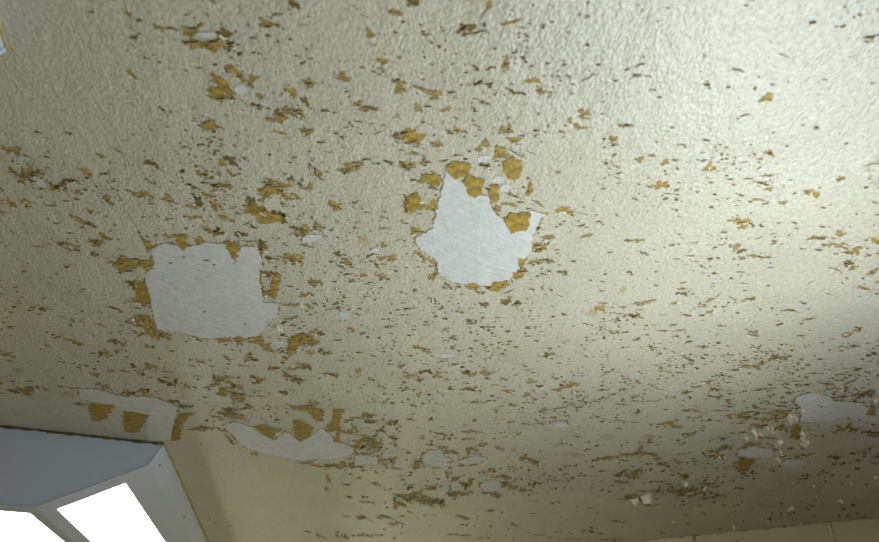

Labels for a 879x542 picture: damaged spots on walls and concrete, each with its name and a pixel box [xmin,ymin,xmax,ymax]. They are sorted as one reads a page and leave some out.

peeling [388,0,420,19]
peeling [455,1,493,37]
peeling [471,54,546,97]
flaking render [337,80,614,325]
peeling [602,124,635,184]
peeling [632,155,681,201]
peeling [728,149,826,209]
flaking render [0,7,413,504]
peeling [719,218,799,269]
peeling [800,226,879,291]
peeling [589,279,726,374]
flaking render [343,327,879,527]